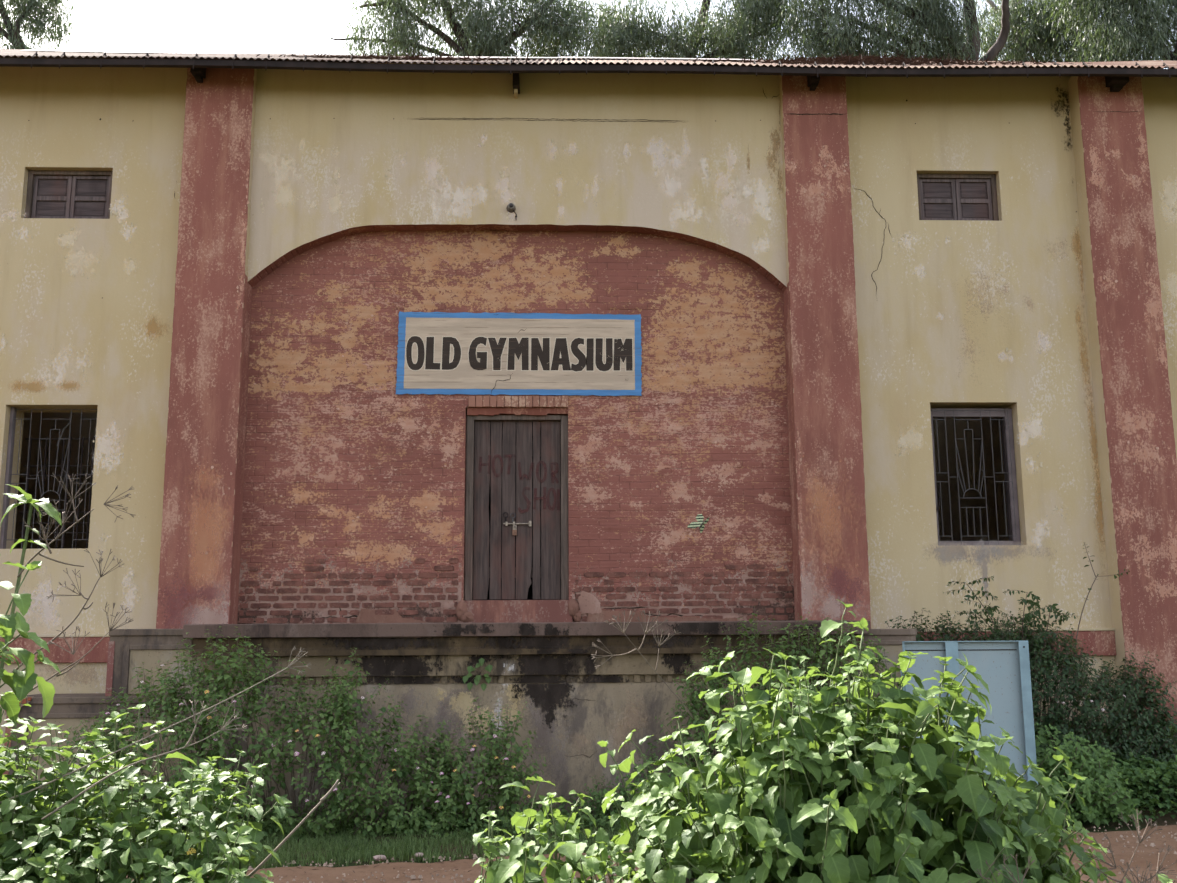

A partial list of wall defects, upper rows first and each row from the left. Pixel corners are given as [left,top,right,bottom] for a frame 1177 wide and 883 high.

peeling [623,133,775,253]
peeling [785,143,850,205]
crack [853,186,890,294]
mould [1051,87,1073,151]
peeling [1087,115,1149,190]
peeling [1097,255,1177,381]
peeling [235,166,860,624]
peeling [186,466,232,590]
peeling [1106,401,1177,607]
damp [323,604,648,789]